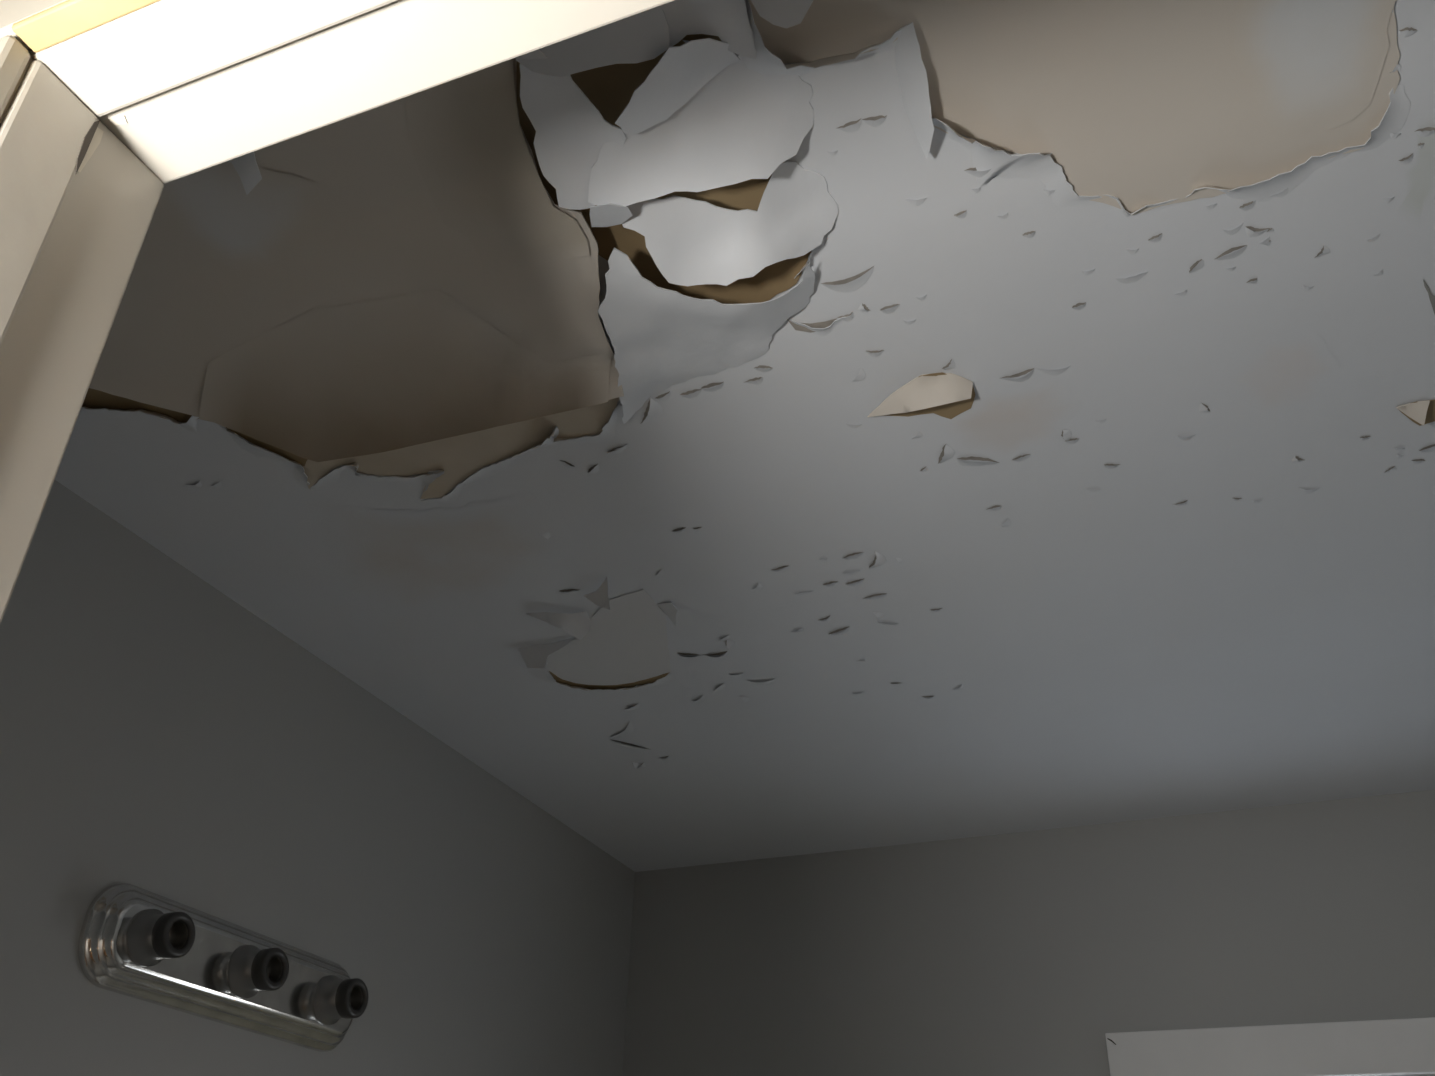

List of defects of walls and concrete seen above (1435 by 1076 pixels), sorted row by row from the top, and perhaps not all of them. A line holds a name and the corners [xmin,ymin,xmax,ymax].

peeling [80,0,1435,503]